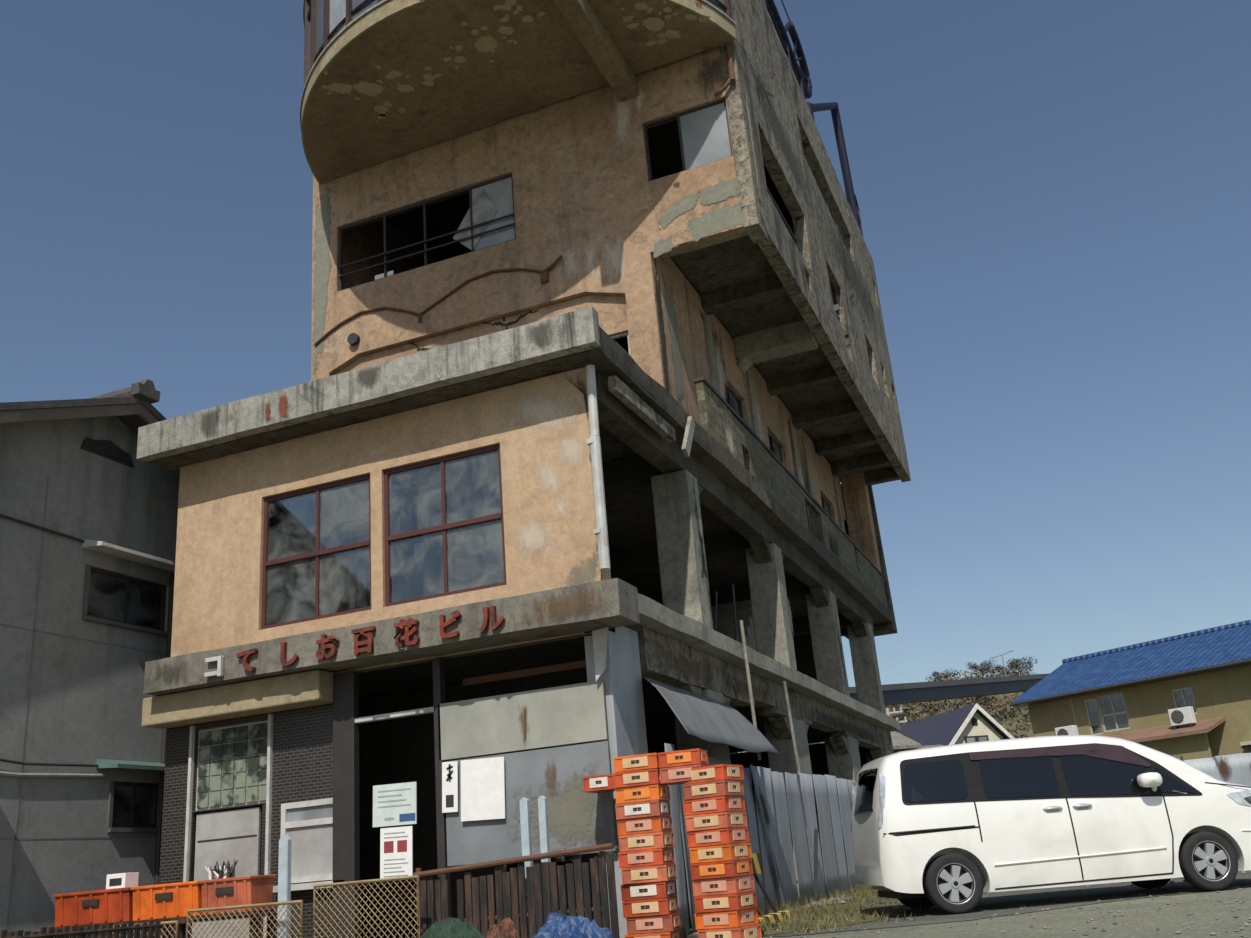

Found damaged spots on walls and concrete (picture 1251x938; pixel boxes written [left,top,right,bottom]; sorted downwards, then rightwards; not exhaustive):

peeling [322,0,546,123]
leakage [755,81,808,197]
crack [409,310,538,350]
spalling [653,178,747,405]
corrosion [1213,756,1232,781]